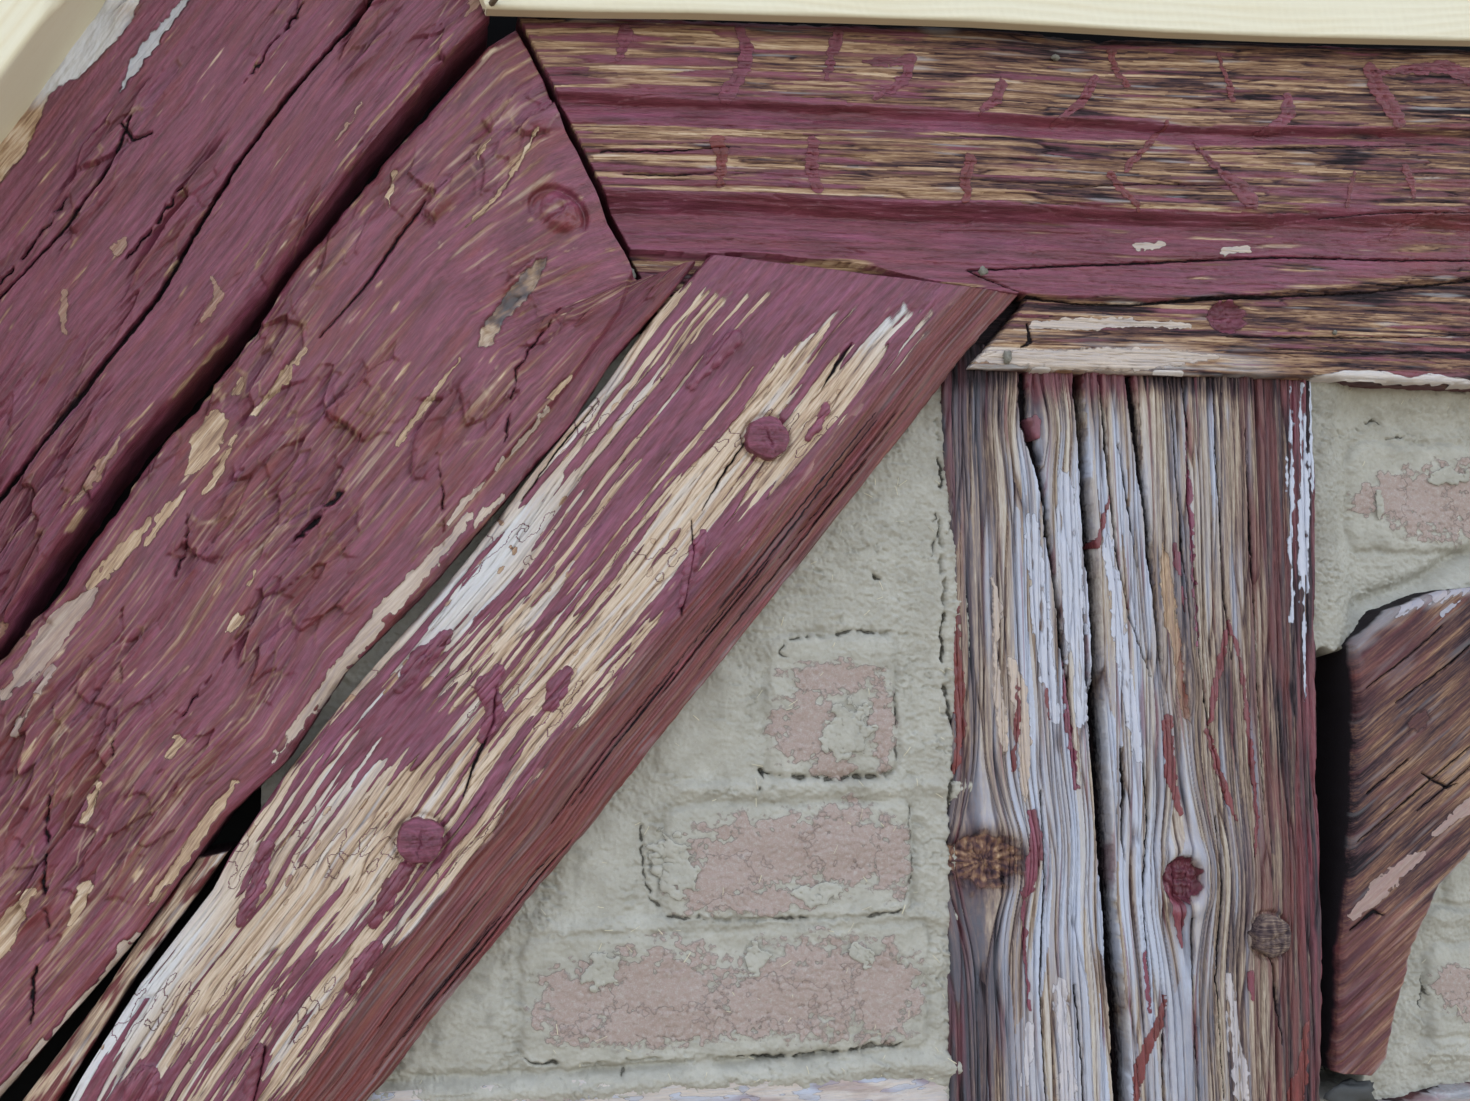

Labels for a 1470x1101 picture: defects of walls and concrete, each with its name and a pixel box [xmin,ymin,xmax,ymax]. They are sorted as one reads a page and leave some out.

crack [0,0,373,503]
crack [321,202,425,336]
spalling [478,257,547,347]
crack [822,345,851,388]
peeling [0,409,238,738]
crack [295,491,344,540]
peeling [67,275,932,1101]
crack [373,401,912,1075]
peeling [990,577,1033,803]
crack [968,257,1470,1101]
peeling [0,888,37,959]
peeling [0,932,141,1097]